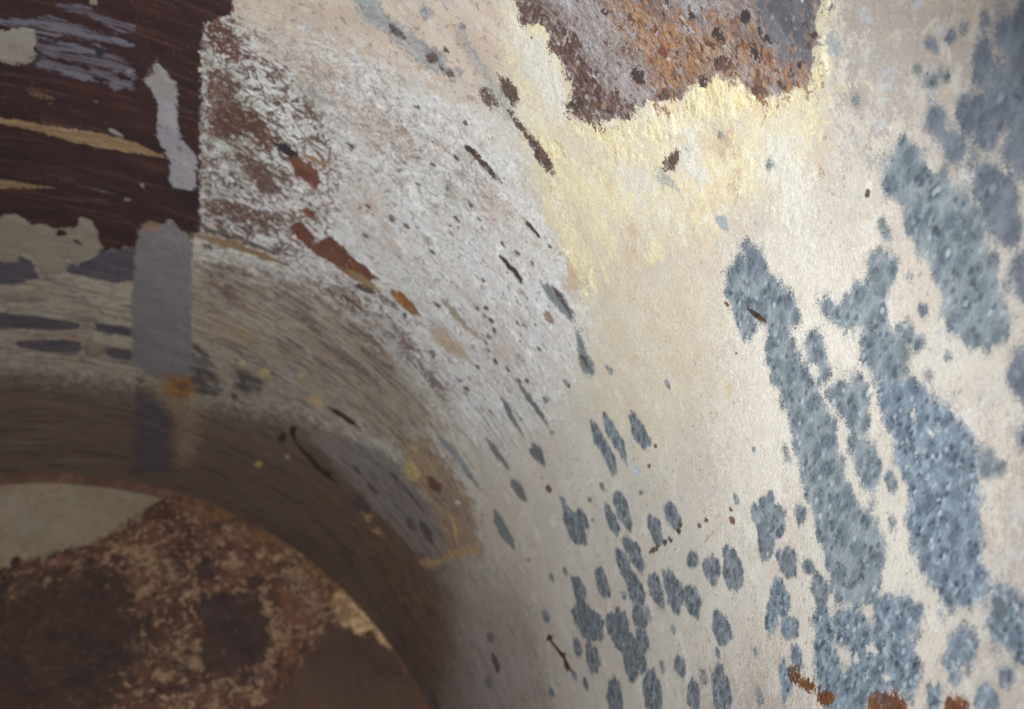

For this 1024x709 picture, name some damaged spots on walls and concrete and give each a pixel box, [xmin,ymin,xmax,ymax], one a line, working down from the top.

peeling [0,0,198,191]
rust [0,0,424,320]
peeling [864,179,873,198]
peeling [0,214,104,275]
rust [0,494,422,709]
rust [787,663,835,706]
rust [868,688,908,709]
rust [944,691,970,709]